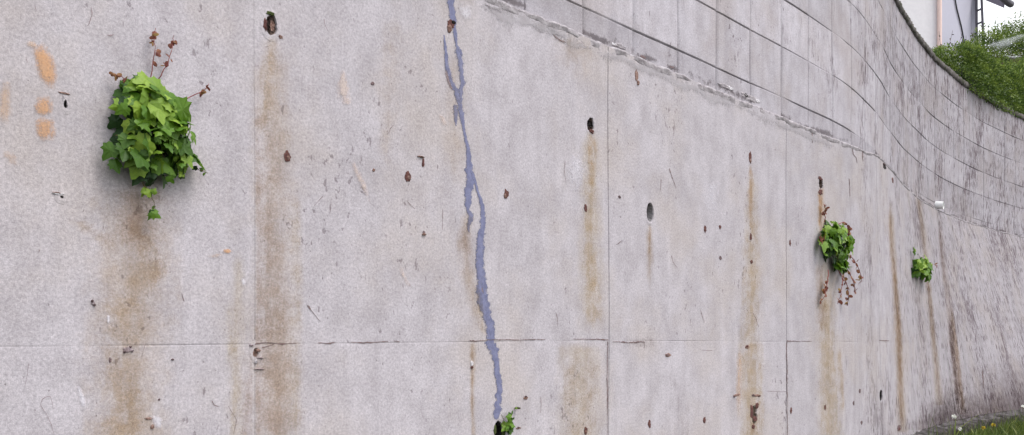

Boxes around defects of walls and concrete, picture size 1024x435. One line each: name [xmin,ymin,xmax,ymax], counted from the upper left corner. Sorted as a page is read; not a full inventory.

rust [35,50,55,82]
crack [442,0,503,420]